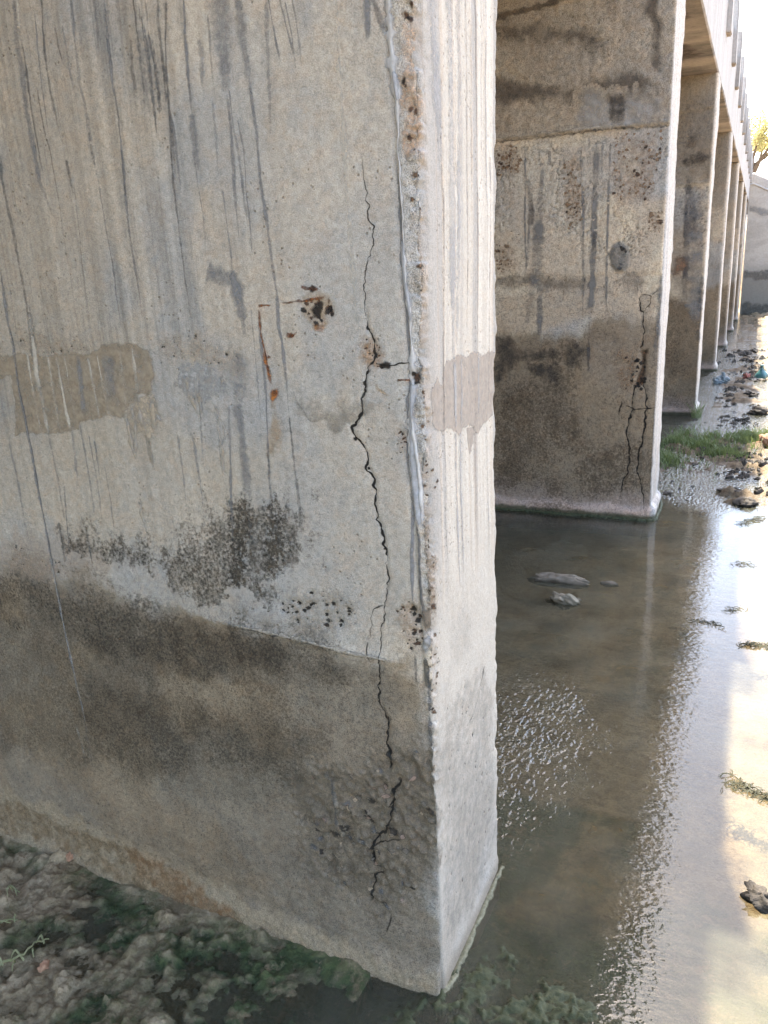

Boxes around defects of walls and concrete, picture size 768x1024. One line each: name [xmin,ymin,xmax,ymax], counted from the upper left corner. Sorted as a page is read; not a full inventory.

leakage [133,0,179,223]
leakage [183,0,210,100]
leakage [0,252,329,696]
leakage [222,88,286,378]
rust [258,304,278,401]
rust [285,285,334,329]
crack [239,171,409,897]
leakage [431,336,590,480]
leakage [524,197,544,254]
leakage [581,182,628,307]
crack [619,384,655,503]
crack [639,291,657,347]